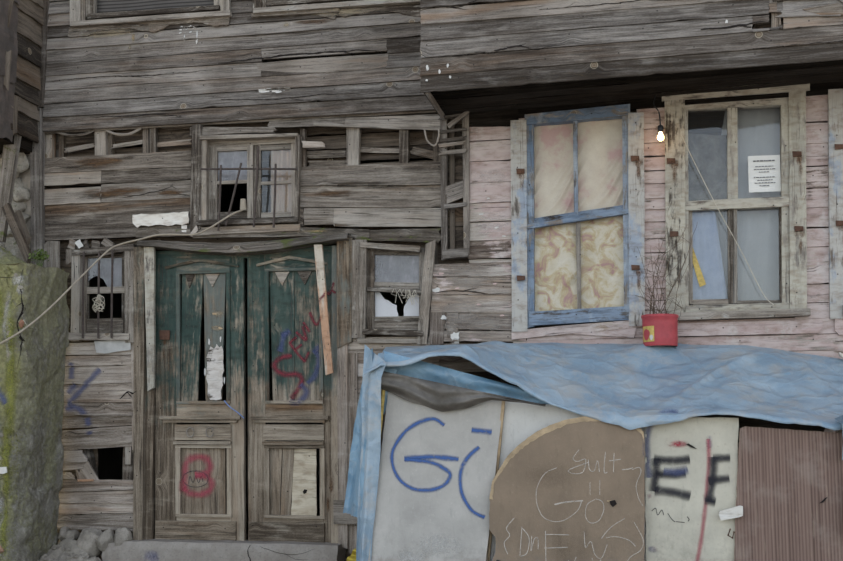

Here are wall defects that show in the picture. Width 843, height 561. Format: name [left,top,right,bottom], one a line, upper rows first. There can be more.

crack [1,270,42,368]
peeling [204,326,225,400]
crack [247,546,311,561]